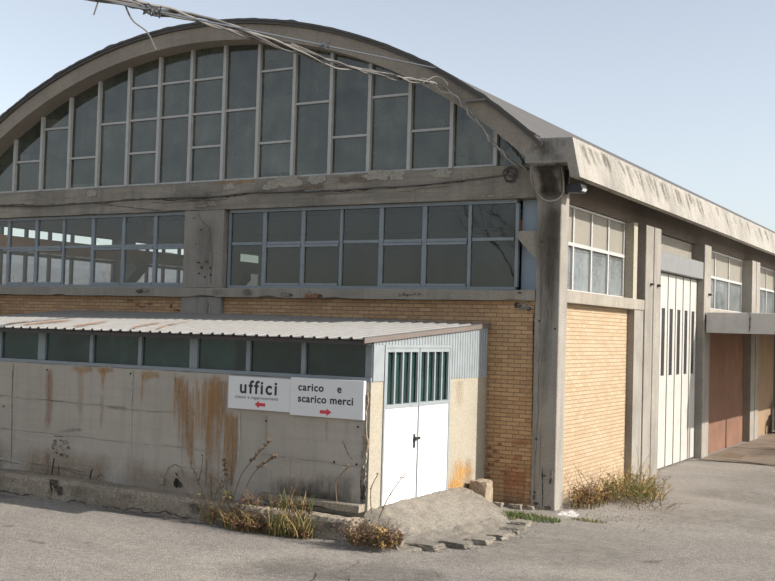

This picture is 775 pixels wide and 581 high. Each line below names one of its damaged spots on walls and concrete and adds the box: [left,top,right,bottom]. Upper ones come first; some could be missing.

peeling [262,175,326,191]
peeling [339,170,405,183]